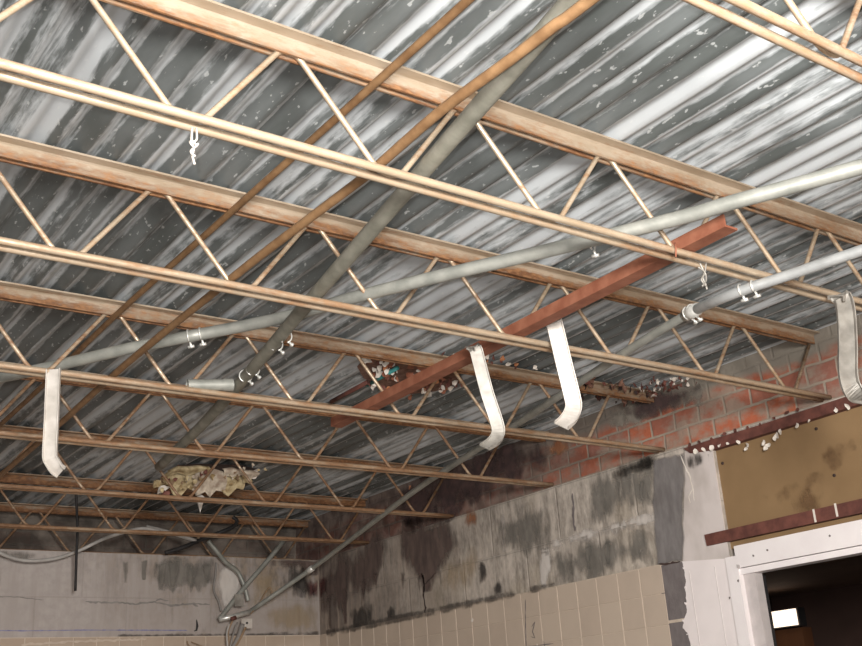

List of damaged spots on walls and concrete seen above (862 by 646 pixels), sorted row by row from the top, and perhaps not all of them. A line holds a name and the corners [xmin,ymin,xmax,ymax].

water stain [273,535,514,635]
water stain [401,518,453,591]
crack [421,573,436,613]
peeling [653,440,749,646]